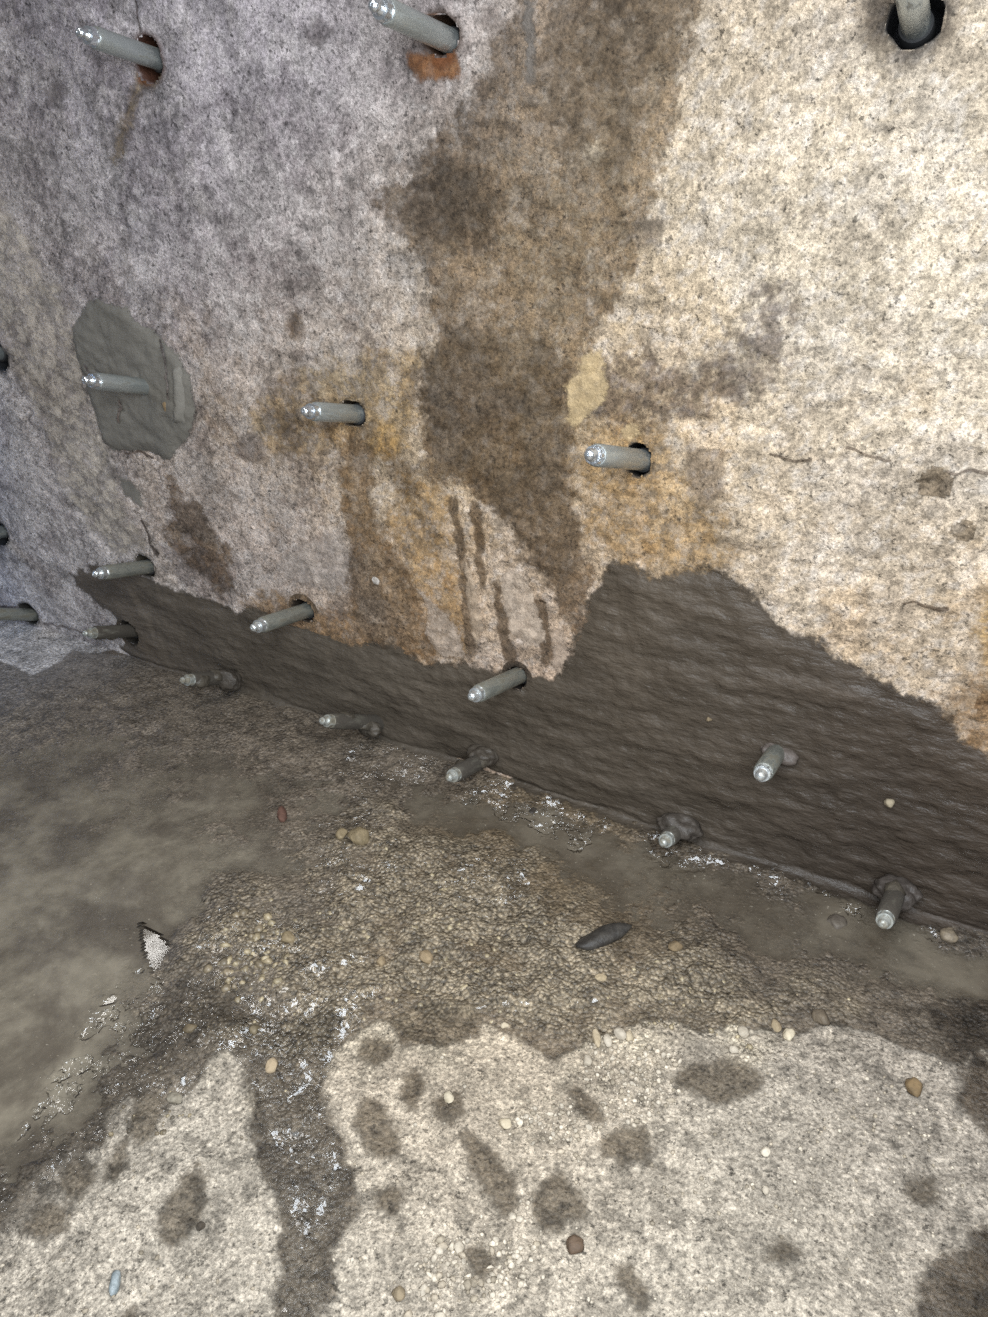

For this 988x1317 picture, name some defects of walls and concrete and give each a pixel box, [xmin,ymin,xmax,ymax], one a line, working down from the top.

rust [406,50,460,81]
water stain [373,0,798,664]
rust [246,347,472,653]
water stain [337,424,437,665]
water stain [0,650,988,1317]